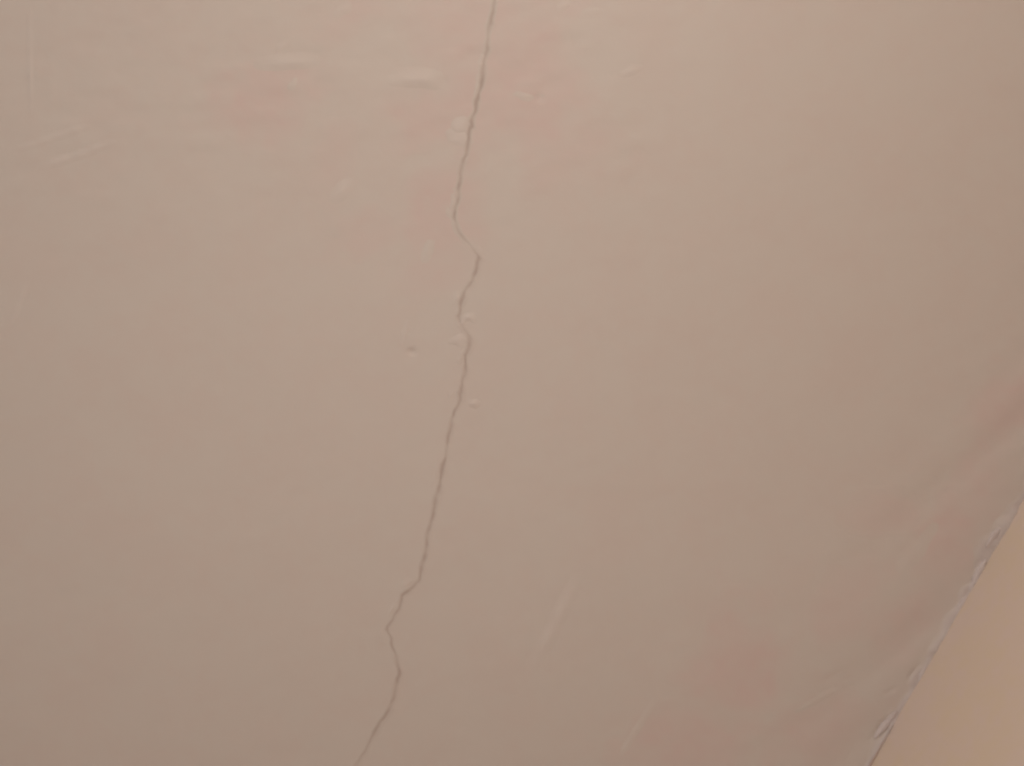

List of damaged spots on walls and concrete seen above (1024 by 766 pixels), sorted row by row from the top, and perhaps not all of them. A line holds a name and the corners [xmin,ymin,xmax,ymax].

crack [351,0,498,766]